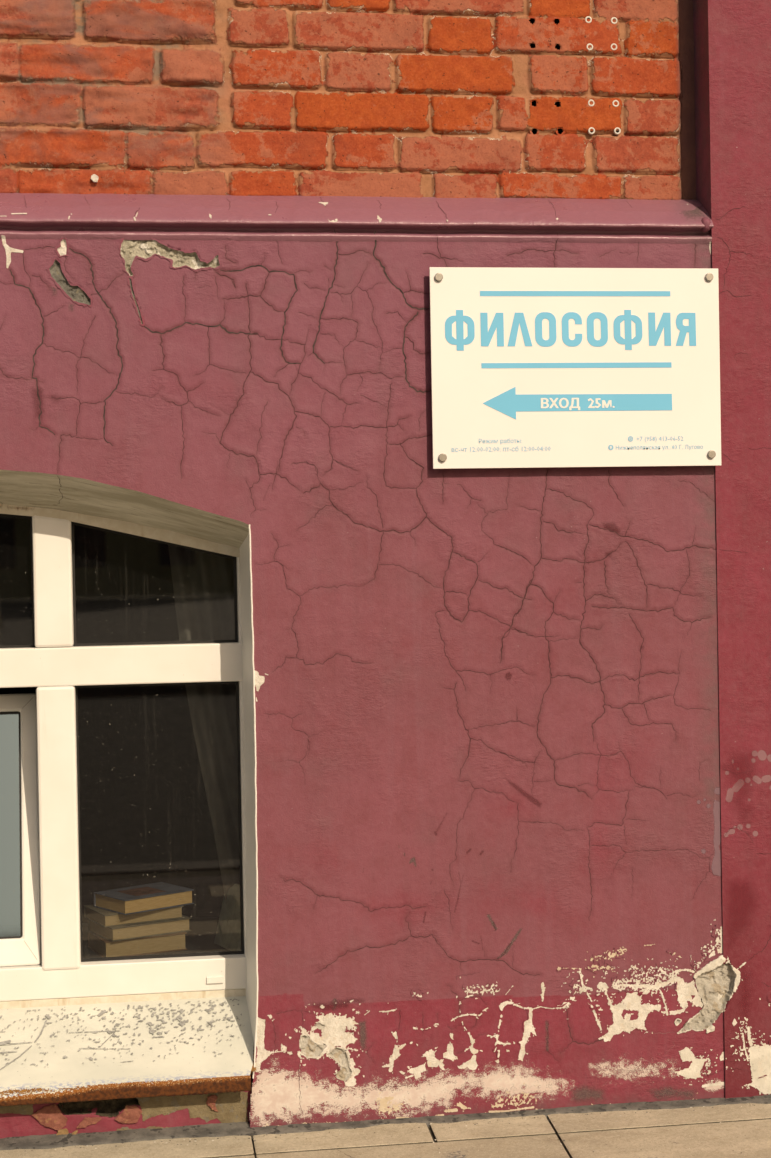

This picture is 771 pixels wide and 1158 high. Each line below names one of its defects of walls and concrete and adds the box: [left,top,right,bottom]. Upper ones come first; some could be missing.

peeling [1,235,23,268]
flaking render [46,238,92,307]
flaking render [119,238,221,326]
crack [0,197,771,1053]
peeling [0,999,242,1070]
peeling [242,1000,411,1119]
flaking render [382,919,771,1095]
peeling [0,1091,248,1135]
peeling [435,1102,471,1116]
peeling [485,1083,542,1113]